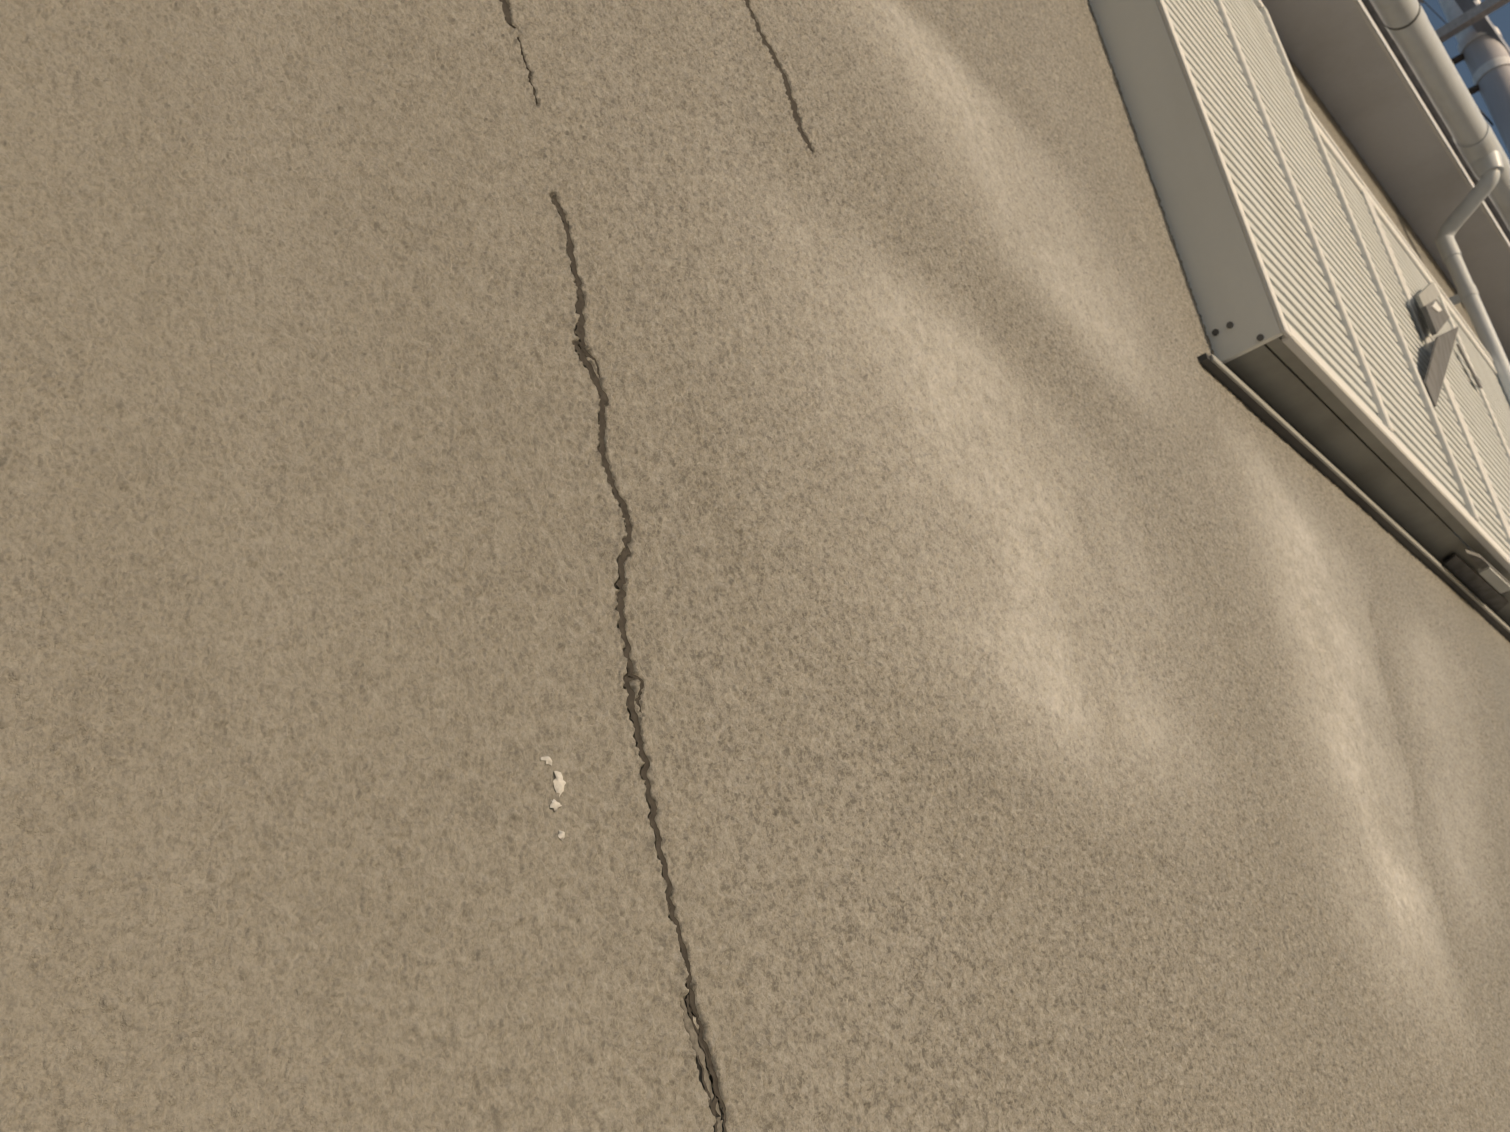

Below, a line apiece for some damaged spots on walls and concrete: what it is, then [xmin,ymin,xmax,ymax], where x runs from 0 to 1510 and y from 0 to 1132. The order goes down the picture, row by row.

crack [499,0,537,105]
crack [745,0,813,153]
crack [552,195,727,1132]